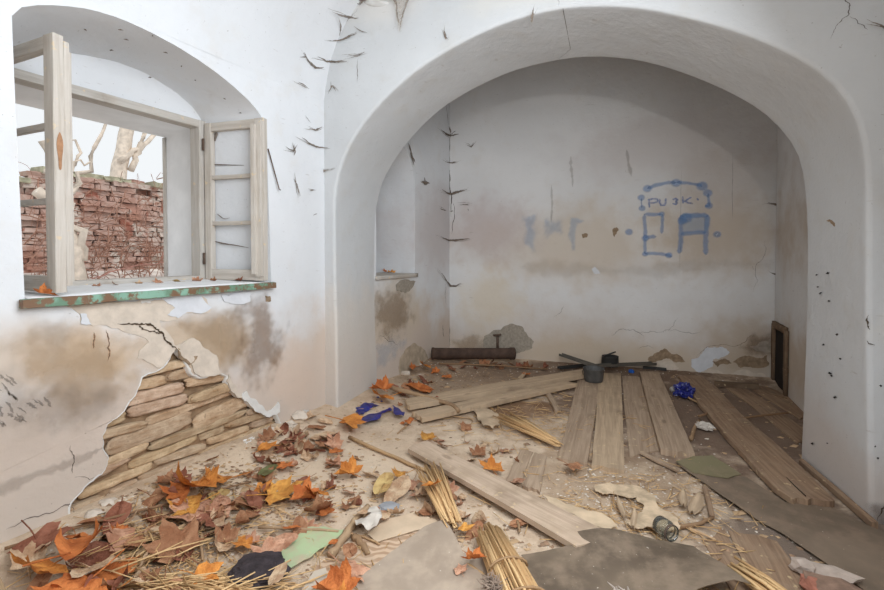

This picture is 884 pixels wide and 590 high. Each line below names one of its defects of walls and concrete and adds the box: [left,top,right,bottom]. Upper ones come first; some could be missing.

crack [121,323,176,348]
spalling [483,324,534,353]
flaking render [648,347,769,377]
spalling [67,294,282,515]